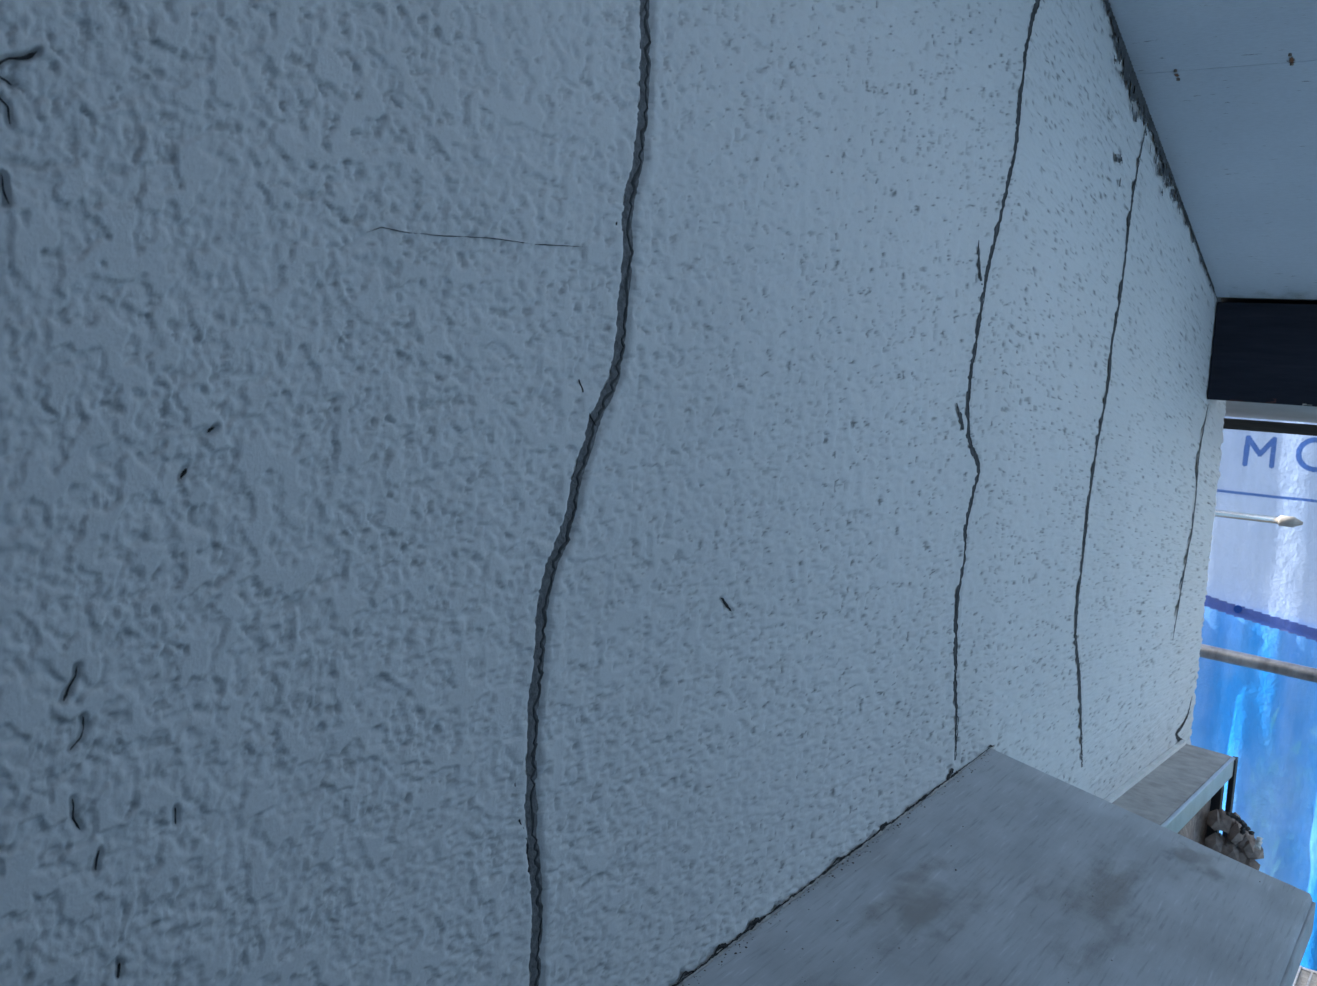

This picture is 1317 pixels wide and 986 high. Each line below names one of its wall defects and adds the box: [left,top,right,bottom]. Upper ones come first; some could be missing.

crack [366,227,581,247]
crack [515,0,651,986]
crack [672,0,1040,986]
crack [1074,1,1217,767]